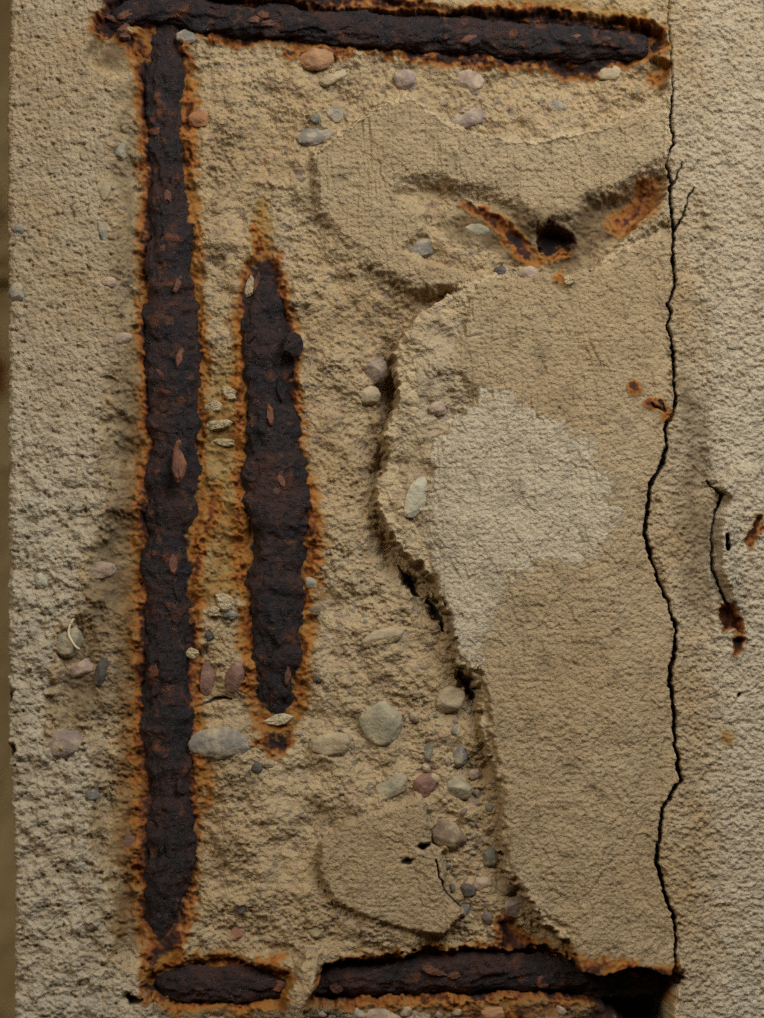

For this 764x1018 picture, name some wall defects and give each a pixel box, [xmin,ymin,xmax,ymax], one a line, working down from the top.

spalling [43,33,146,928]
rust [87,0,295,1017]
spalling [104,0,686,1018]
rust [175,0,675,761]
rust [307,911,684,1018]
crack [642,2,694,958]
crack [705,480,730,606]